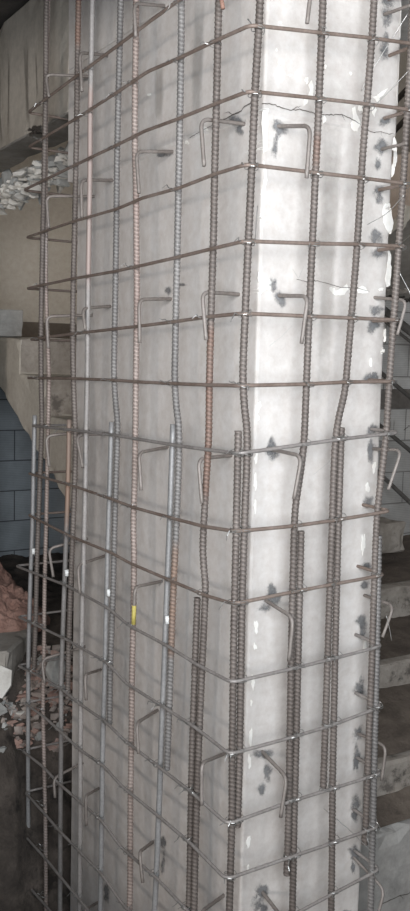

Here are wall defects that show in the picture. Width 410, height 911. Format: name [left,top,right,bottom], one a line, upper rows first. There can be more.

spalling [0,0,95,911]
crack [190,103,392,138]
spalling [320,0,410,911]